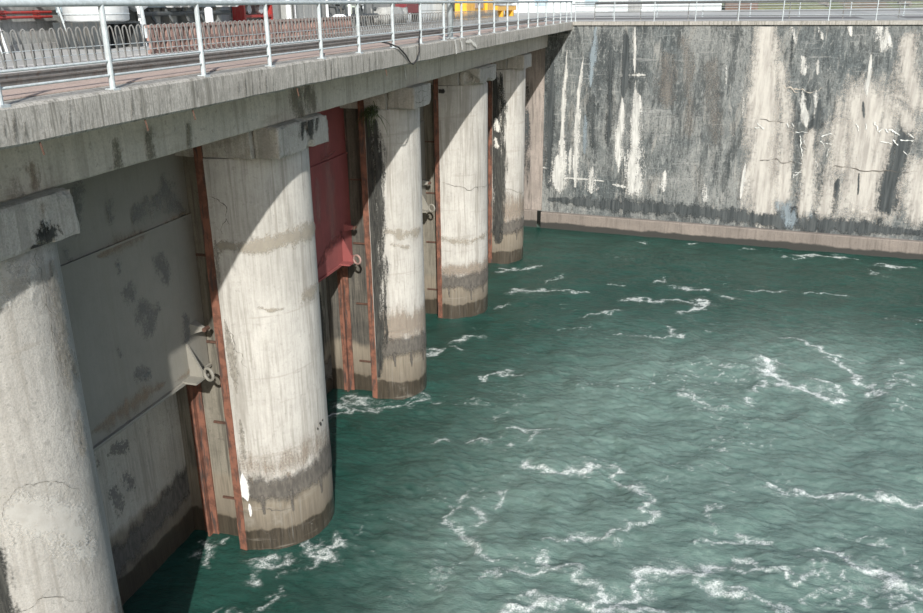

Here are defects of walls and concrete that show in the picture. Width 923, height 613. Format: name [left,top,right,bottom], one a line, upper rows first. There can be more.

water stain [442,72,524,244]
water stain [543,26,923,237]
water stain [35,221,63,245]
water stain [365,112,427,378]
water stain [109,466,190,577]
water stain [238,430,332,514]
water stain [0,549,19,613]